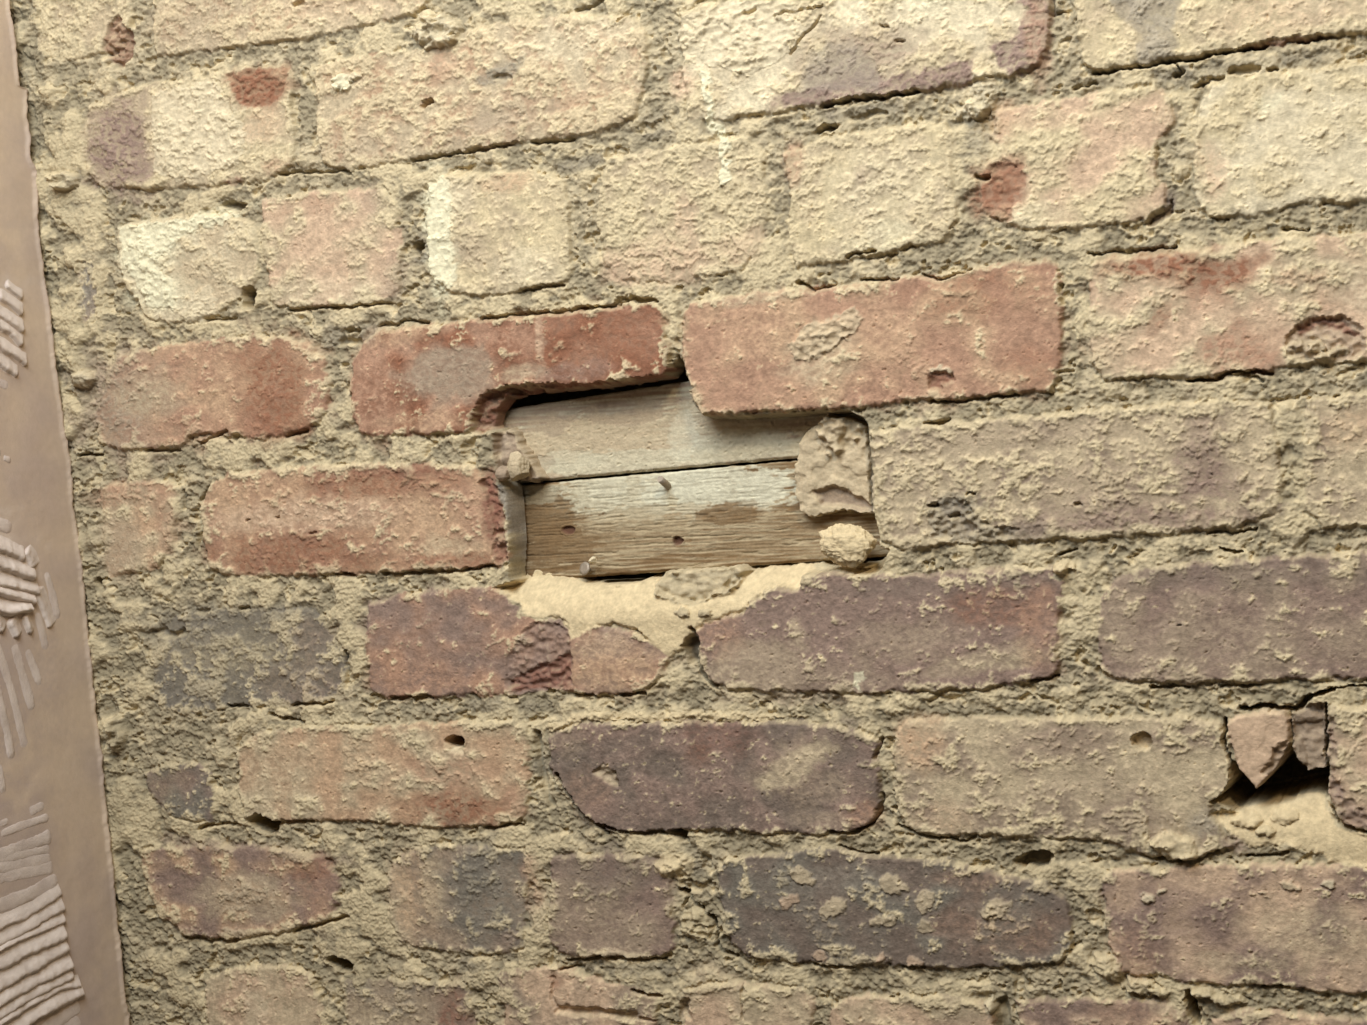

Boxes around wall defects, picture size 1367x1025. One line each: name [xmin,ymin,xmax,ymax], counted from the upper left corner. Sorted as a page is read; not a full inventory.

spalling [1285,313,1367,364]
spalling [470,352,872,459]
spalling [477,476,527,581]
spalling [504,617,574,693]
spalling [1211,701,1367,830]